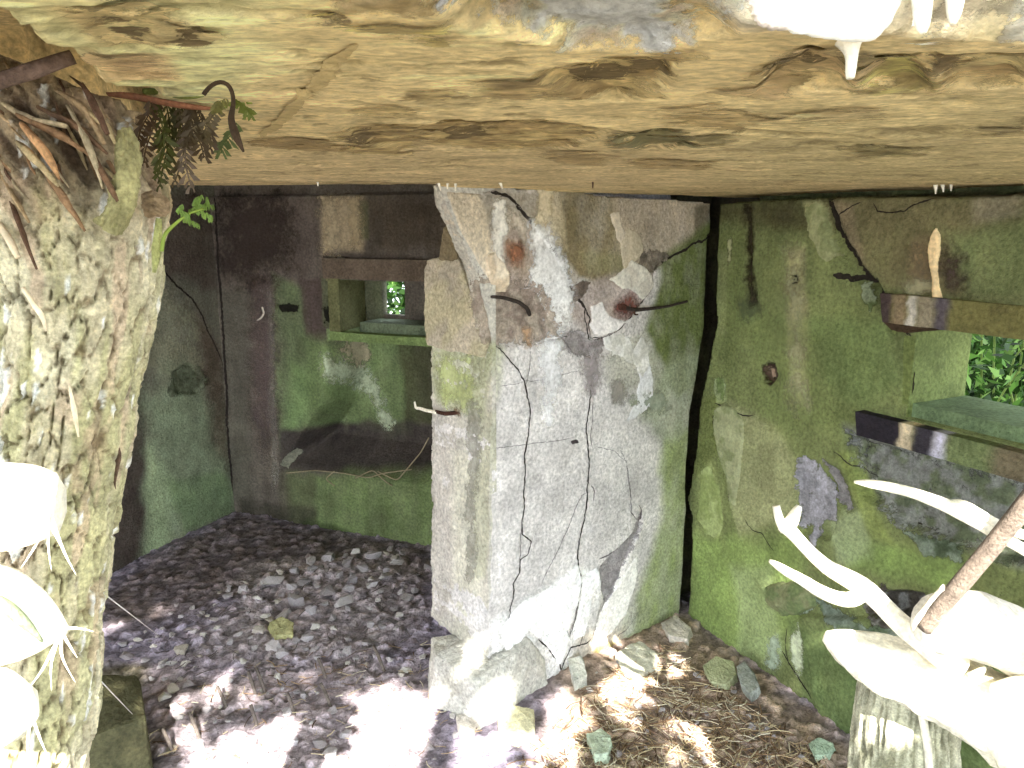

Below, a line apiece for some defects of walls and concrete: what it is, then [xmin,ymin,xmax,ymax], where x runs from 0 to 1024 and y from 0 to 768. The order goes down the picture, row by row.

crack [489,191,532,224]
corrosion [505,242,524,267]
flaking render [610,212,669,299]
crack [668,236,710,259]
crack [829,196,934,293]
crack [165,198,233,489]
spalling [468,251,653,421]
corrosion [613,294,639,319]
crack [496,269,651,671]
spalling [794,455,854,548]
spalling [845,428,1024,567]
flaking render [501,515,643,665]